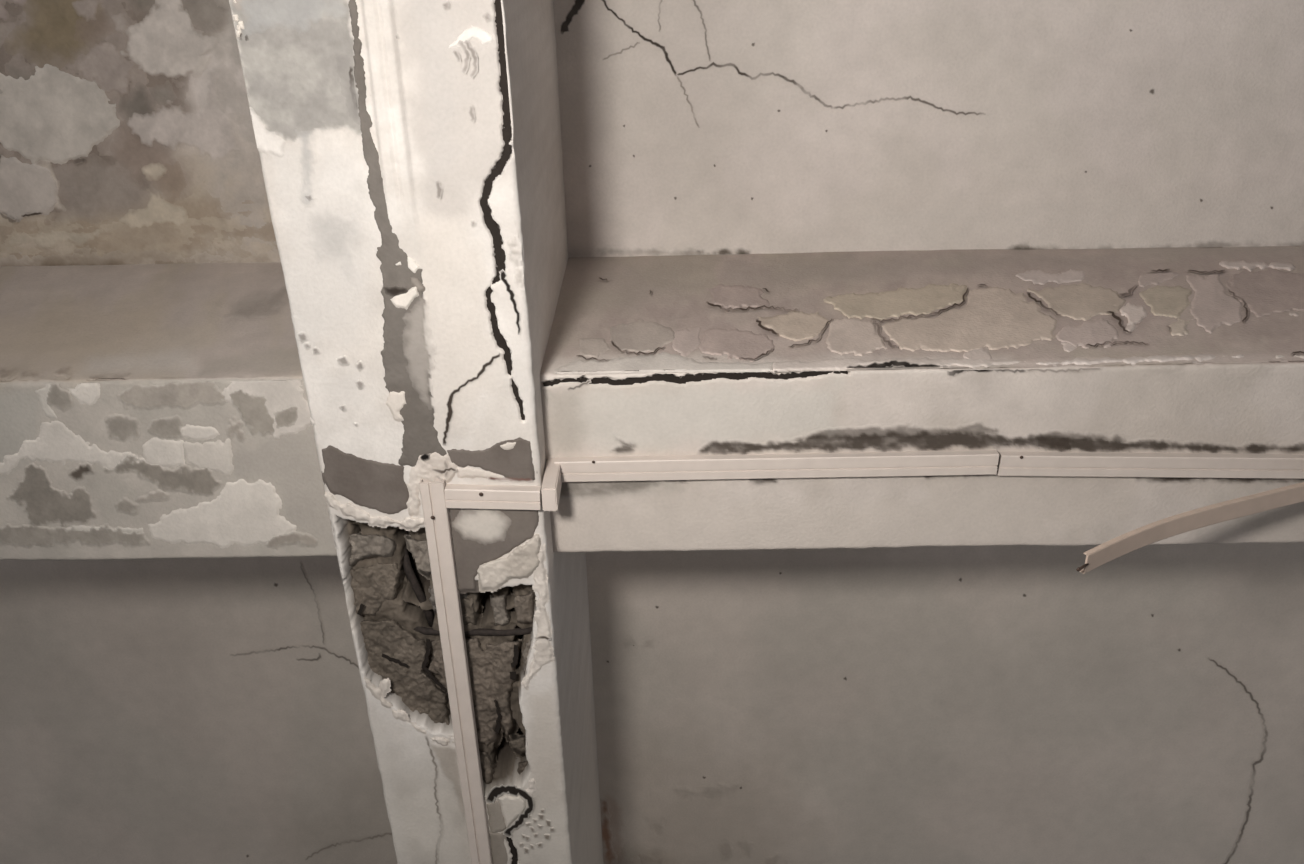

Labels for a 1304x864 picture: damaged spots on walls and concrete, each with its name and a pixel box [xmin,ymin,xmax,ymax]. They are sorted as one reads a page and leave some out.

peeling [0,0,372,249]
crack [431,0,1100,477]
peeling [554,246,1304,374]
water stain [560,480,690,499]
water stain [918,474,1003,482]
water stain [696,419,1304,455]
water stain [1131,477,1304,487]
crack [229,562,359,669]
spalling [324,491,455,746]
spalling [460,536,555,854]
crack [486,784,534,864]
crack [1207,657,1269,864]